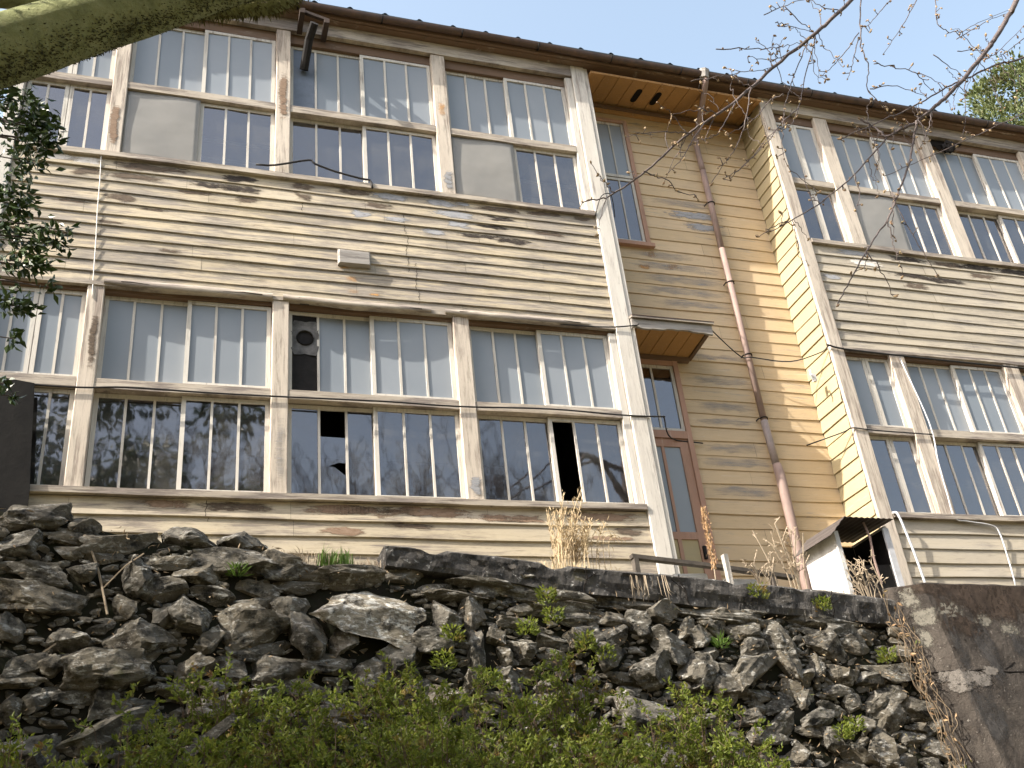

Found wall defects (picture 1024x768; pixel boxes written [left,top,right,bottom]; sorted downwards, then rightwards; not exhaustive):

peeling [278,75,287,118]
peeling [109,105,120,143]
peeling [43,154,259,203]
peeling [352,192,407,222]
peeling [423,198,562,245]
peeling [142,500,271,511]